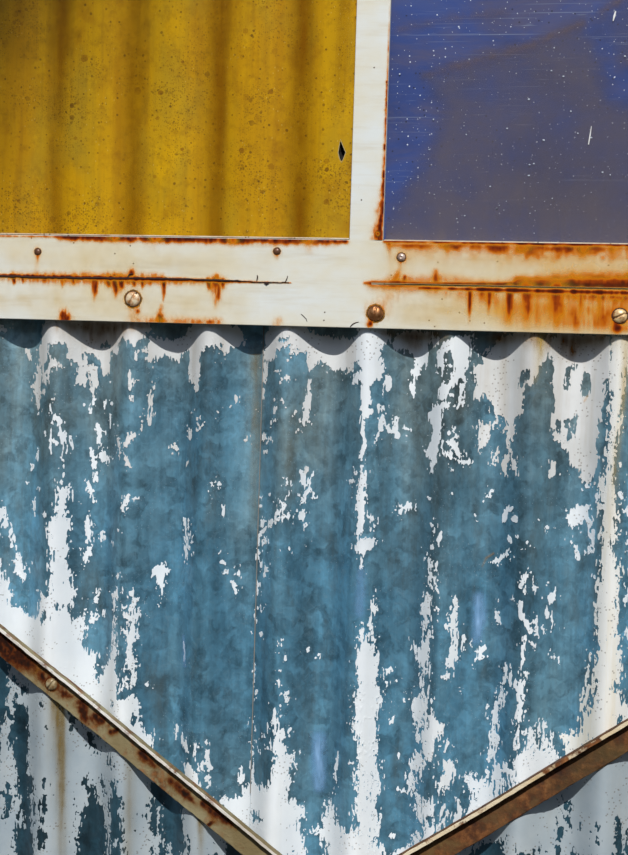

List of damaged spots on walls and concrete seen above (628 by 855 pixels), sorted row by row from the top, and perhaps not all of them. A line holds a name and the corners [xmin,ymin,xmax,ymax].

rust [0,269,291,340]
rust [0,235,349,256]
rust [364,45,628,355]
peeling [0,320,247,748]
peeling [168,326,628,855]
peeling [0,656,54,855]
rust [0,632,119,807]
peeling [65,711,136,855]
rust [137,749,156,768]
peeling [137,782,191,855]
rust [167,777,233,827]